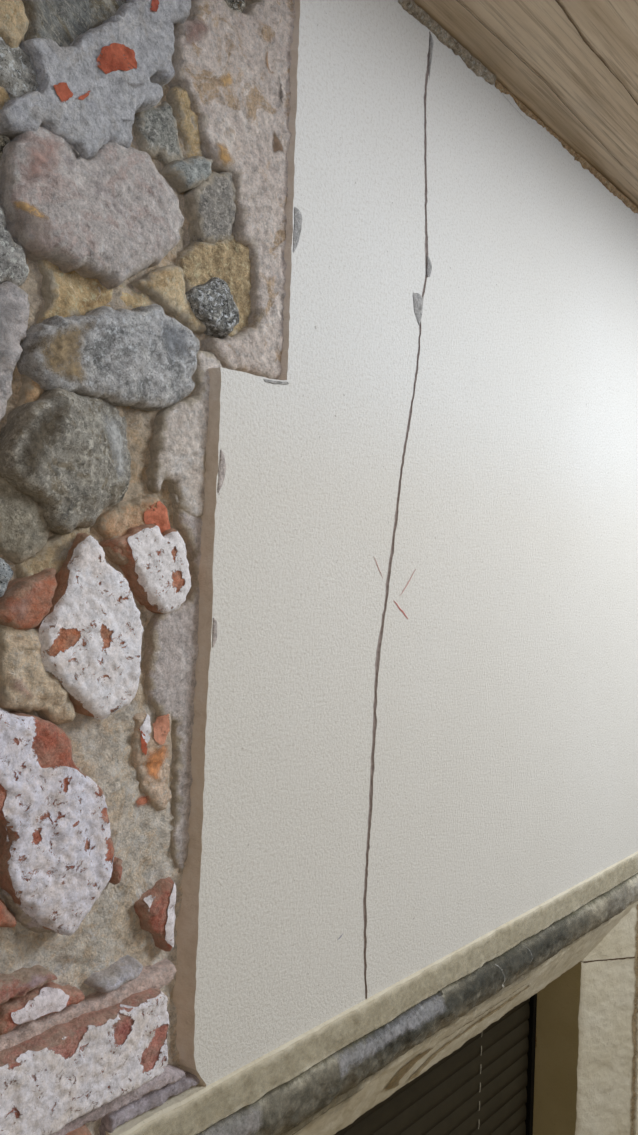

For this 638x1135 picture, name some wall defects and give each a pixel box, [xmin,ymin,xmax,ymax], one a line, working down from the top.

flaking render [0,0,302,1135]
crack [363,32,433,999]